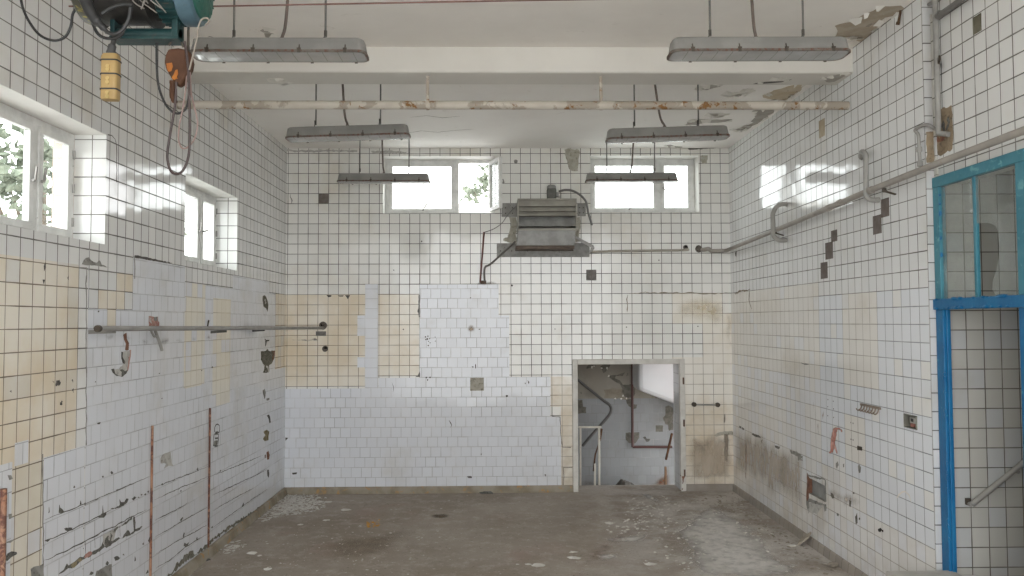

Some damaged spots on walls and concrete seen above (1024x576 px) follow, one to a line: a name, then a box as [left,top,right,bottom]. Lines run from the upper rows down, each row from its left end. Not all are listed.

peeling [835,6,904,42]
peeling [684,77,805,132]
flaking render [926,105,953,163]
flaking render [111,333,131,377]
spalling [98,489,149,518]
spalling [806,473,839,516]
peeling [89,554,136,576]